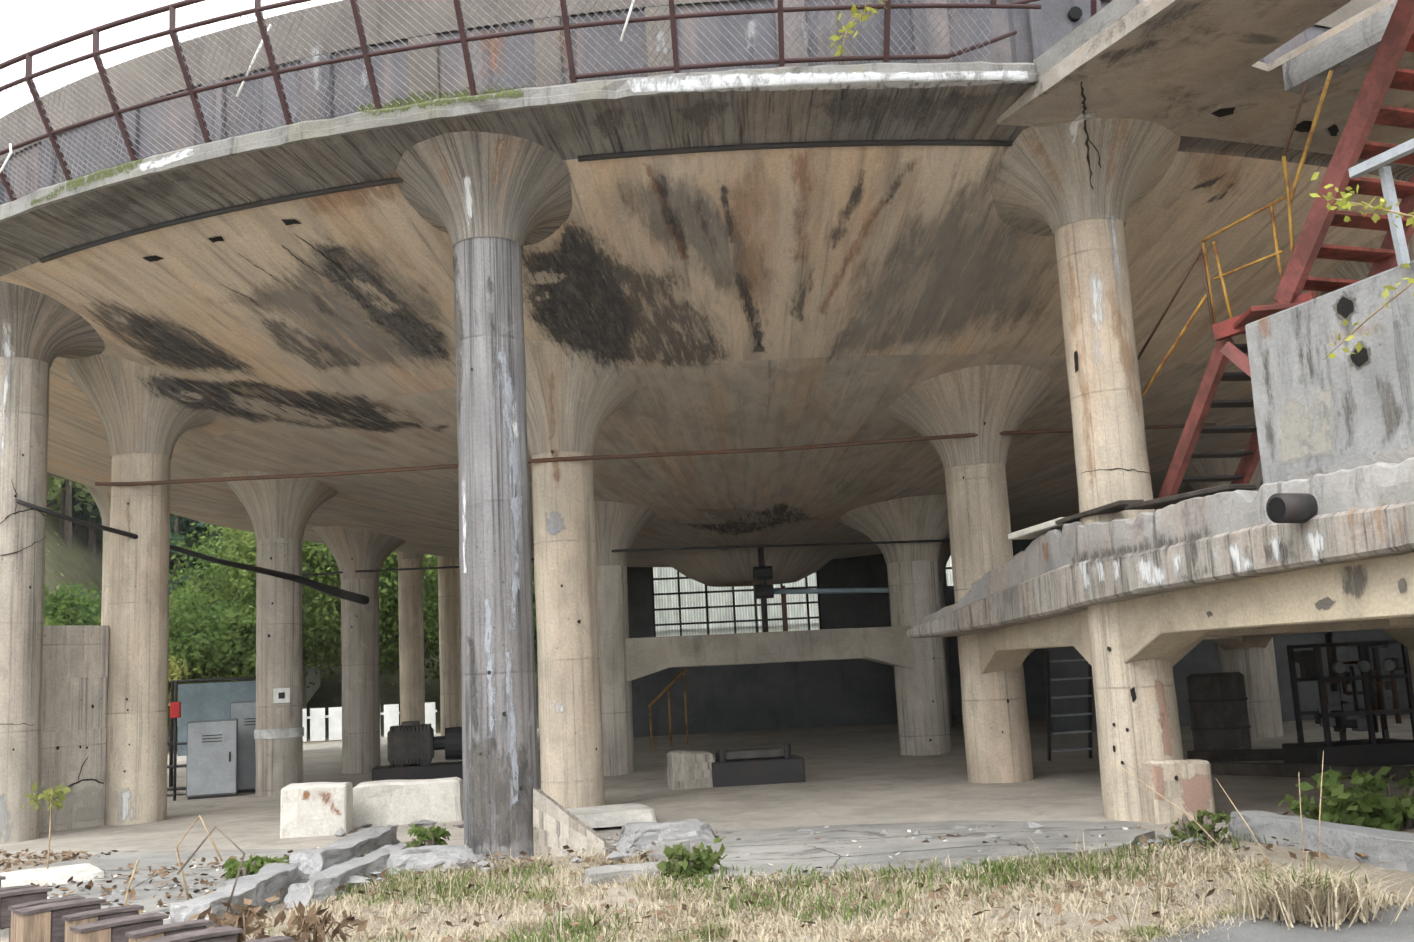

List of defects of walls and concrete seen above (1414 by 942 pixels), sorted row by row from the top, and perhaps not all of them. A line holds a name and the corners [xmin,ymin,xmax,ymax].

crack [1081,82,1101,190]
damp [90,300,447,433]
damp [242,245,463,413]
damp [522,225,727,371]
damp [620,176,767,352]
damp [791,271,812,321]
crack [0,479,48,556]